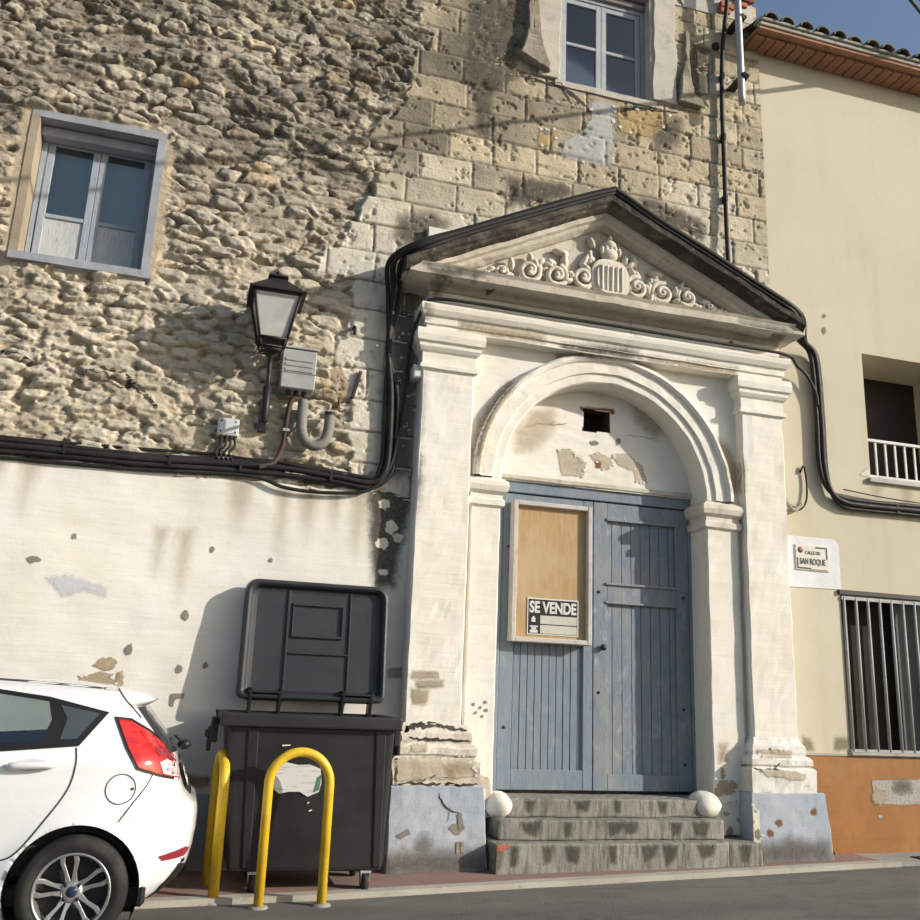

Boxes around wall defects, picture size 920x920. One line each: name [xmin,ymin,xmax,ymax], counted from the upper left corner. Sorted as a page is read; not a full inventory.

leakage [469,0,520,135]
crack [512,74,678,114]
spalling [611,105,674,137]
crack [82,365,158,407]
peeling [557,438,647,484]
peeling [79,657,124,685]
crack [405,721,470,742]
crack [392,757,478,819]
spalling [479,773,491,818]
peeling [872,779,920,819]